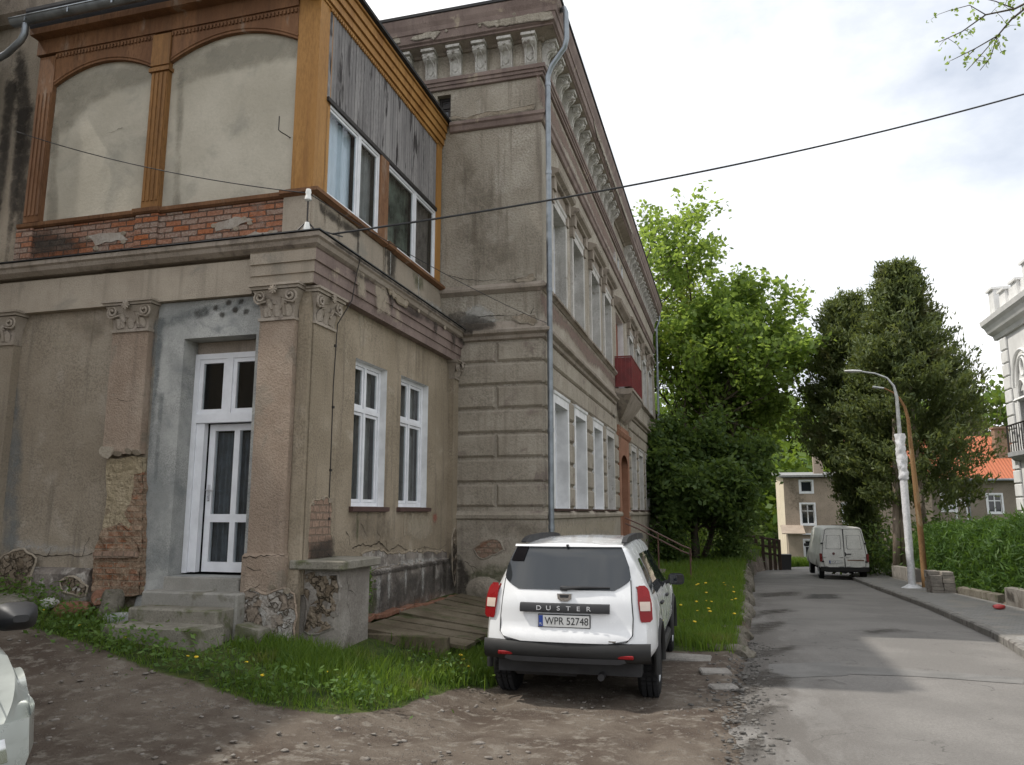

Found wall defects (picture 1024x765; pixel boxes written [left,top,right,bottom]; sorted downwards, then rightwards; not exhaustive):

water stain [0,52,33,231]
flaking render [0,548,37,594]
flaking render [59,446,148,598]
flaking render [269,495,343,636]
crack [346,524,477,577]
flaking render [472,537,505,560]